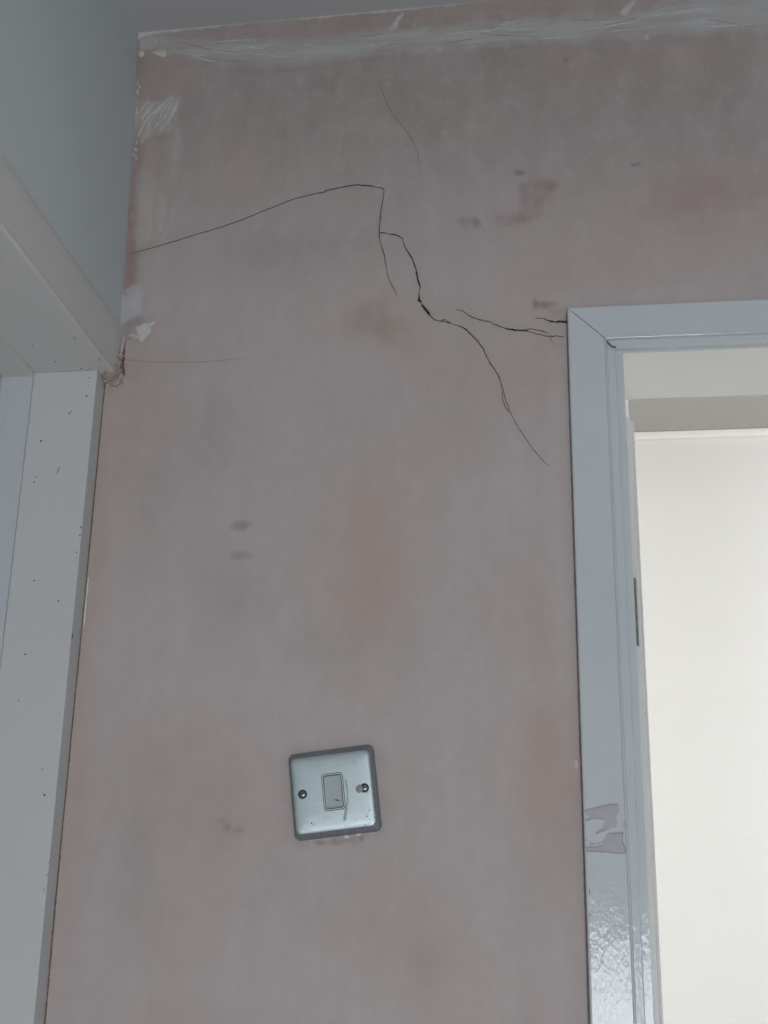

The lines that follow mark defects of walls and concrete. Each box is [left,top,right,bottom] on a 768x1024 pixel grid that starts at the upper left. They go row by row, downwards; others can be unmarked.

crack [130,184,590,1024]